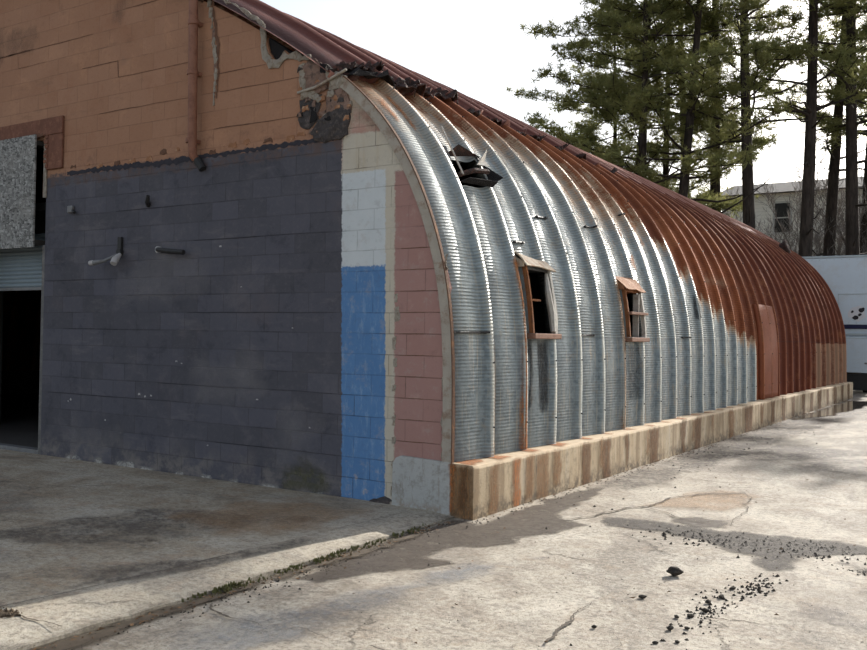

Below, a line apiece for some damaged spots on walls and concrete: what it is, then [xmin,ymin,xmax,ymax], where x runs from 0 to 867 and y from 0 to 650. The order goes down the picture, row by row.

crack [0,34,92,69]
spalling [67,0,458,176]
rust [381,97,413,127]
peeling [467,108,502,126]
rust [450,258,565,520]
rust [580,433,611,485]
rust [616,280,629,465]
rust [647,407,734,463]
rust [745,383,850,432]
crack [0,525,349,626]